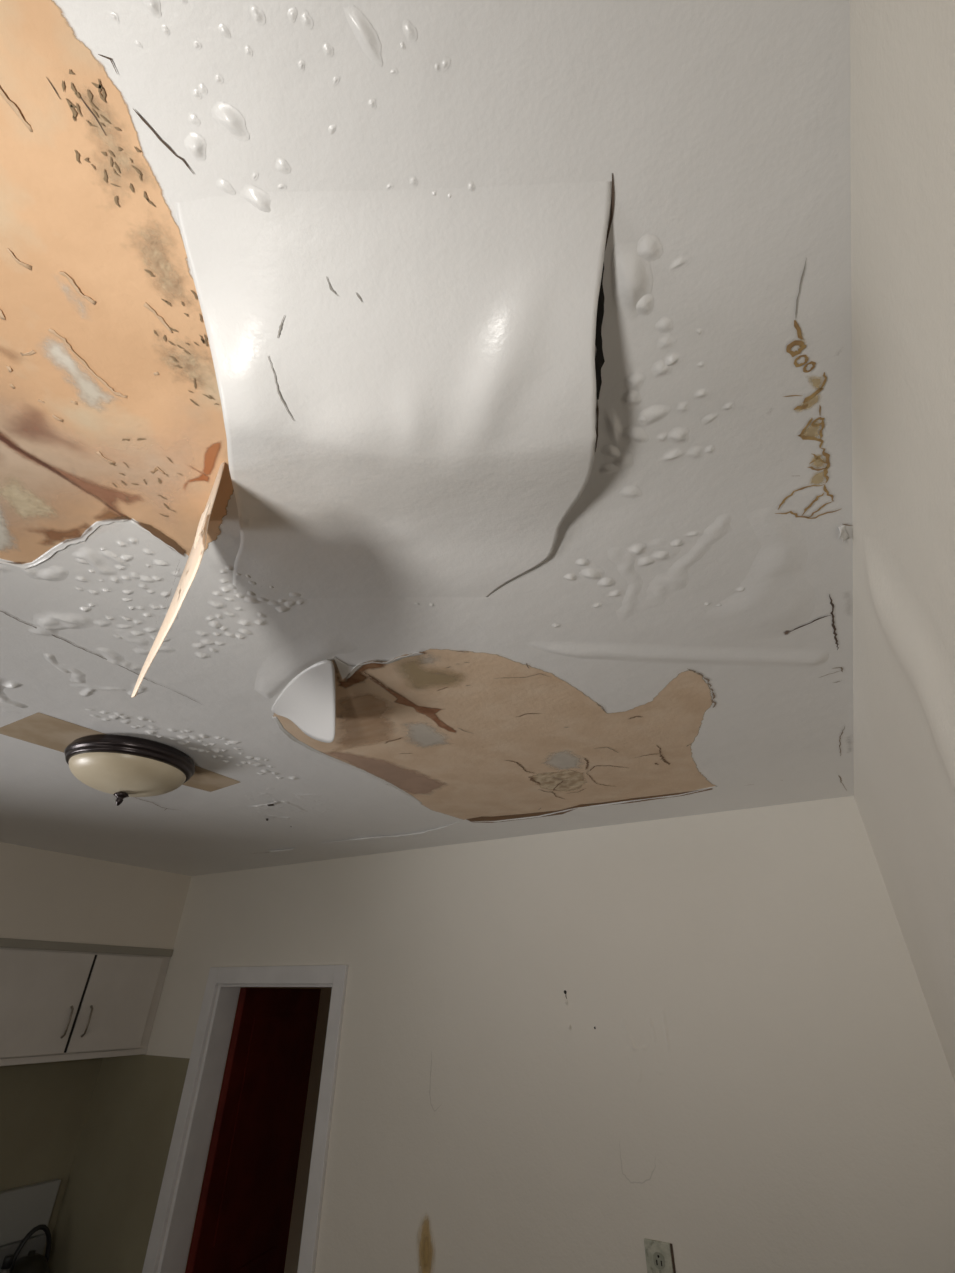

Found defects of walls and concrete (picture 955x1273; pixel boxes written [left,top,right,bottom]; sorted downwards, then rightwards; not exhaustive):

peeling [0,88,33,132]
peeling [62,69,155,207]
peeling [20,328,127,408]
peeling [0,481,53,550]
water stain [419,1219,433,1273]